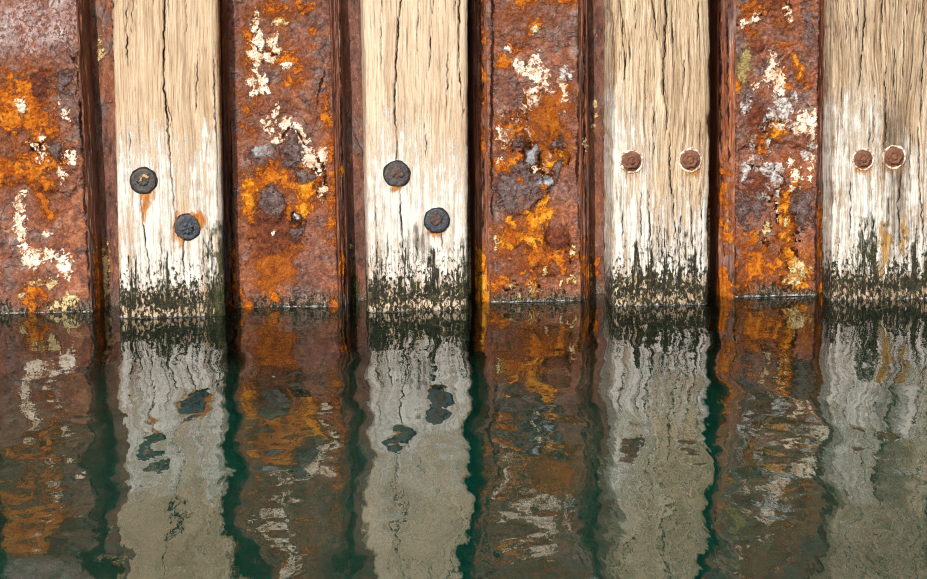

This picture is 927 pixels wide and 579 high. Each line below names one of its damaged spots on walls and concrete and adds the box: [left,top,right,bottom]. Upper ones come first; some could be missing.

crack [111,0,187,205]
water stain [116,109,225,310]
crack [140,196,205,283]
crack [195,54,216,131]
crack [375,190,418,271]
water stain [363,105,468,305]
crack [380,0,464,158]
water stain [604,72,708,298]
crack [619,0,702,263]
water stain [822,89,927,294]
crack [841,0,925,242]